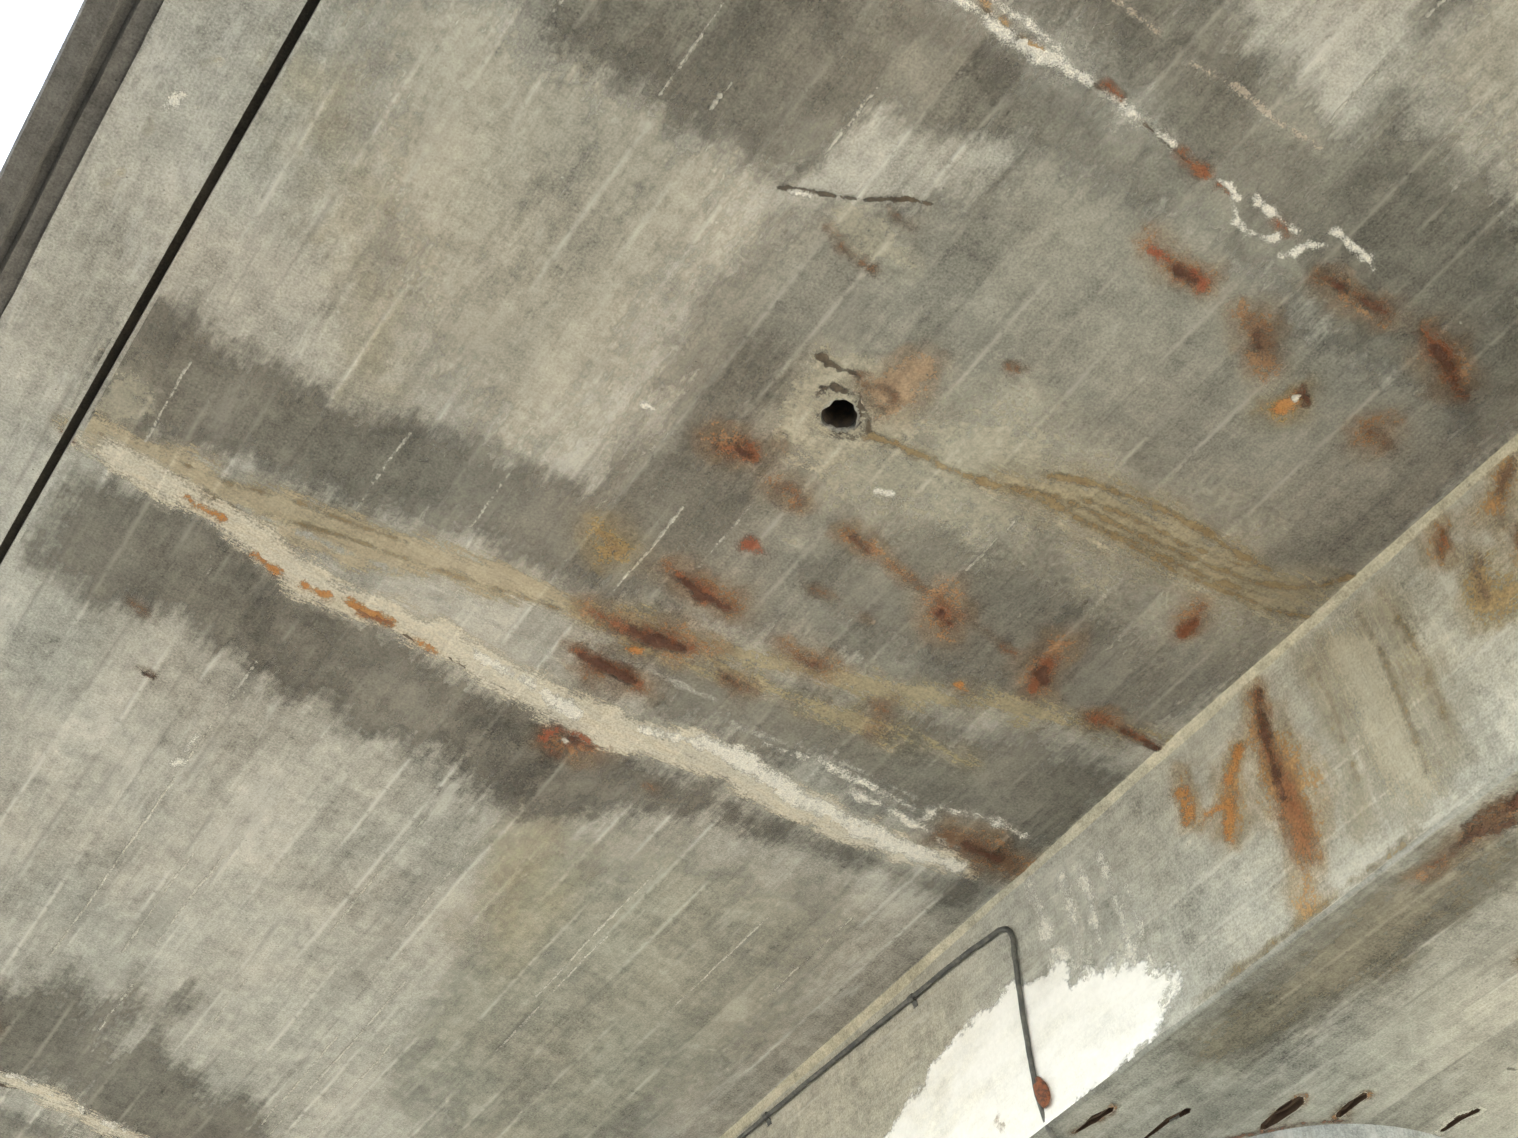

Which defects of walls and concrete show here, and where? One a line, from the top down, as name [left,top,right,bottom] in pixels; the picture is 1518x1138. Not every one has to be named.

crack [777,185,933,206]
crack [954,0,1374,271]
rust [1132,224,1315,425]
leakage [26,0,1518,907]
crack [52,372,1173,880]
rust [564,556,759,700]
rust [1172,679,1331,920]
leakage [1179,821,1518,1066]
crack [0,1071,148,1138]
leakage [0,965,267,1138]
spalling [1071,1104,1117,1134]
spalling [1144,1108,1191,1138]